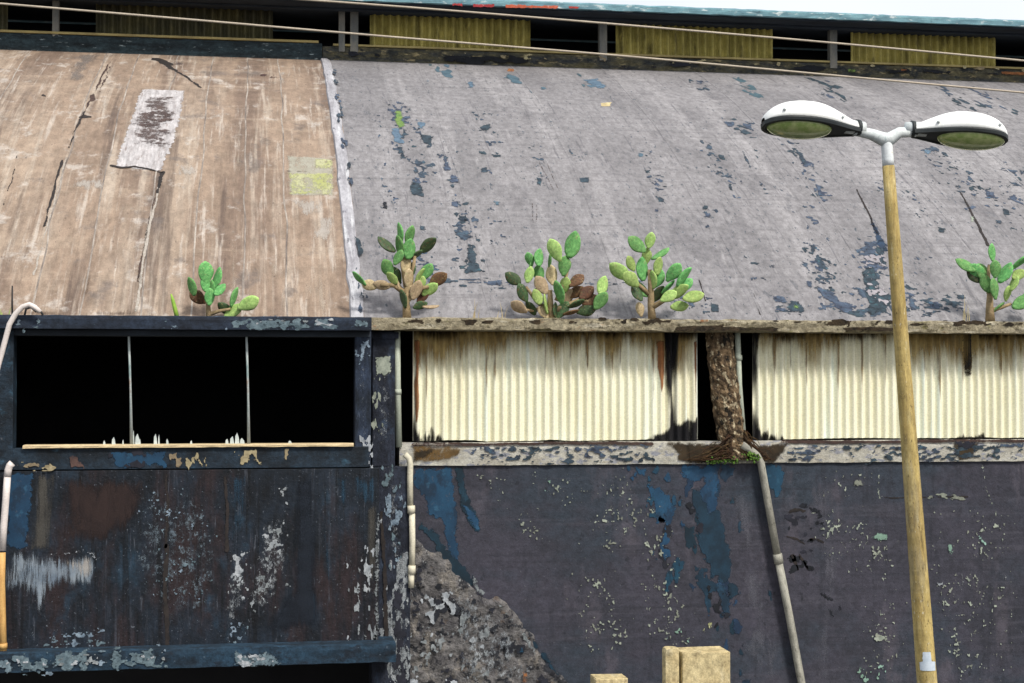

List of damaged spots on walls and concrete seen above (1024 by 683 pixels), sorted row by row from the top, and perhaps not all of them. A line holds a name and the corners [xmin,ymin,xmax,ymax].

crack [151,58,201,88]
crack [32,64,110,275]
crack [135,177,163,311]
peeling [377,101,512,289]
peeling [773,140,893,331]
crack [856,189,887,251]
crack [960,192,990,246]
corrosion [413,320,708,422]
water stain [8,476,97,604]
peeling [0,628,168,676]
peeling [228,522,291,667]
spalling [346,340,743,683]